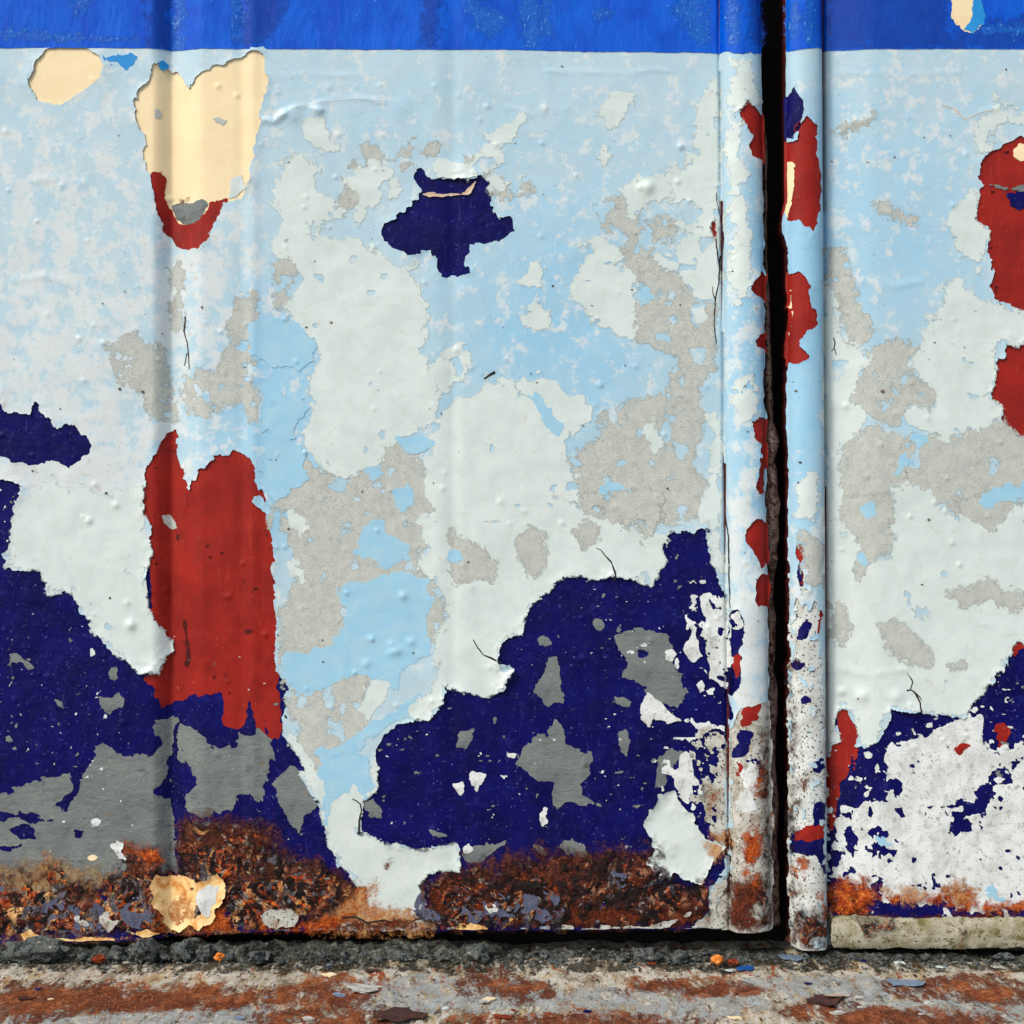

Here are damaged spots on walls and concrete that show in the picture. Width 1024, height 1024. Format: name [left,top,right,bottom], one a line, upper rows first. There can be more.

peeling [27,48,103,105]
peeling [133,50,269,335]
peeling [336,137,537,278]
peeling [739,99,765,164]
peeling [781,86,822,231]
peeling [975,136,1024,311]
peeling [0,194,1024,951]
corrosion [0,732,775,943]
corrosion [785,706,801,854]
corrosion [787,874,1024,949]